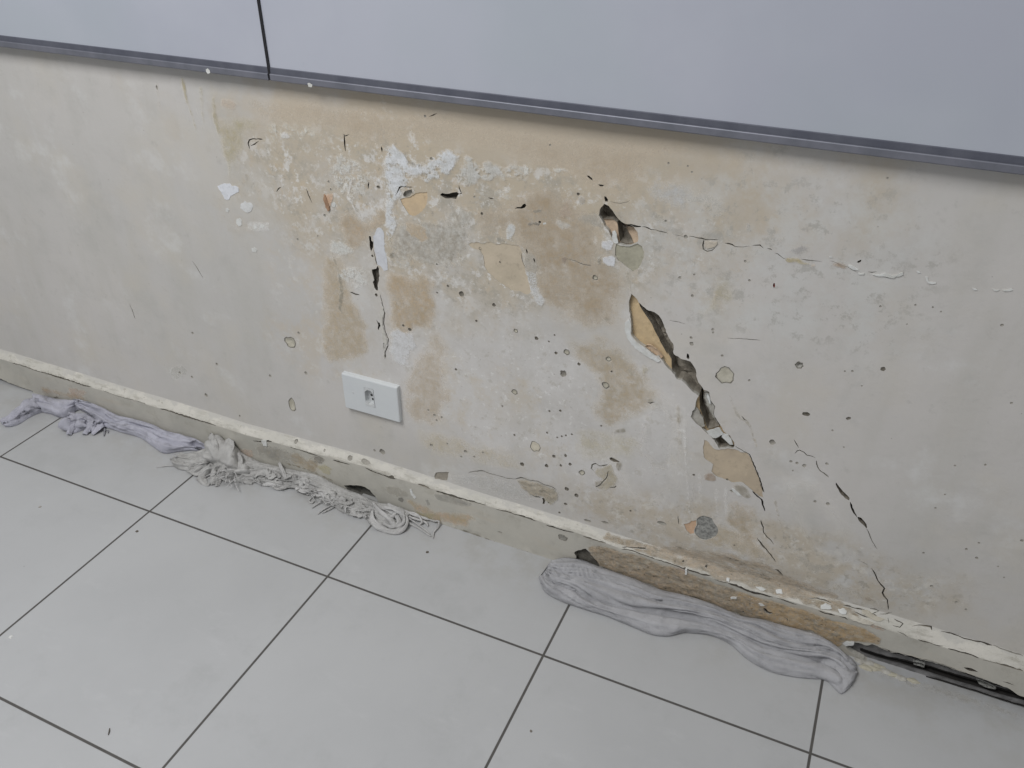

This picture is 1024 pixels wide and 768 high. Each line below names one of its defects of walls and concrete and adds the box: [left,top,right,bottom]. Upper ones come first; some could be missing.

crack [369,236,389,358]
peeling [373,228,388,271]
peeling [397,178,476,242]
water stain [324,145,619,360]
spalling [587,175,644,271]
crack [644,226,936,284]
water stain [577,345,654,432]
peeling [693,440,763,498]
spalling [574,549,600,566]
water stain [588,506,880,646]
crack [794,440,889,630]
spalling [843,641,1024,706]